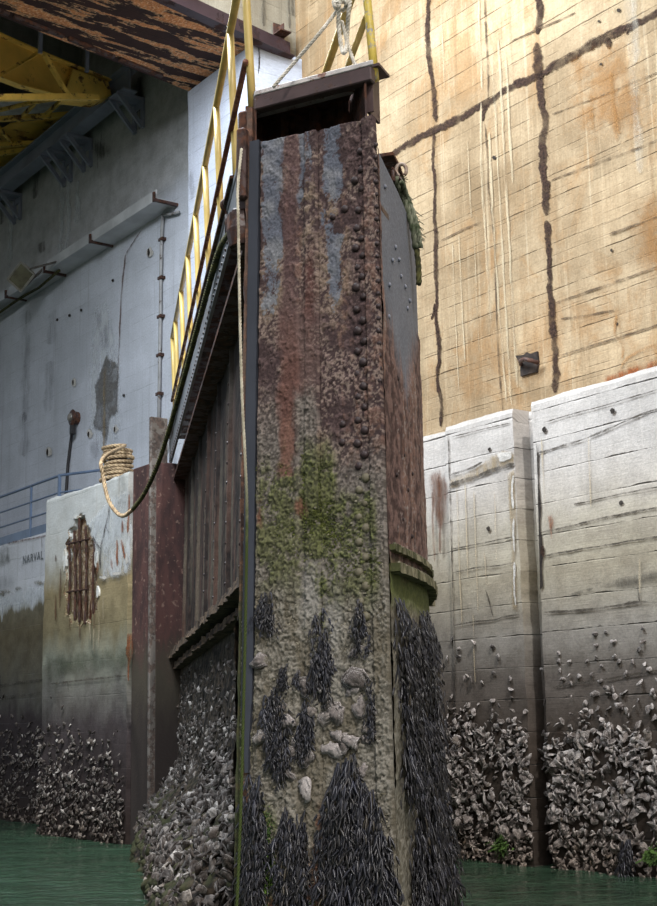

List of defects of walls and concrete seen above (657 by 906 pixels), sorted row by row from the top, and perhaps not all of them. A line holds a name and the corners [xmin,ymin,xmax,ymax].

spalling [87,310,120,447]
crack [392,0,657,709]
spalling [62,497,131,627]